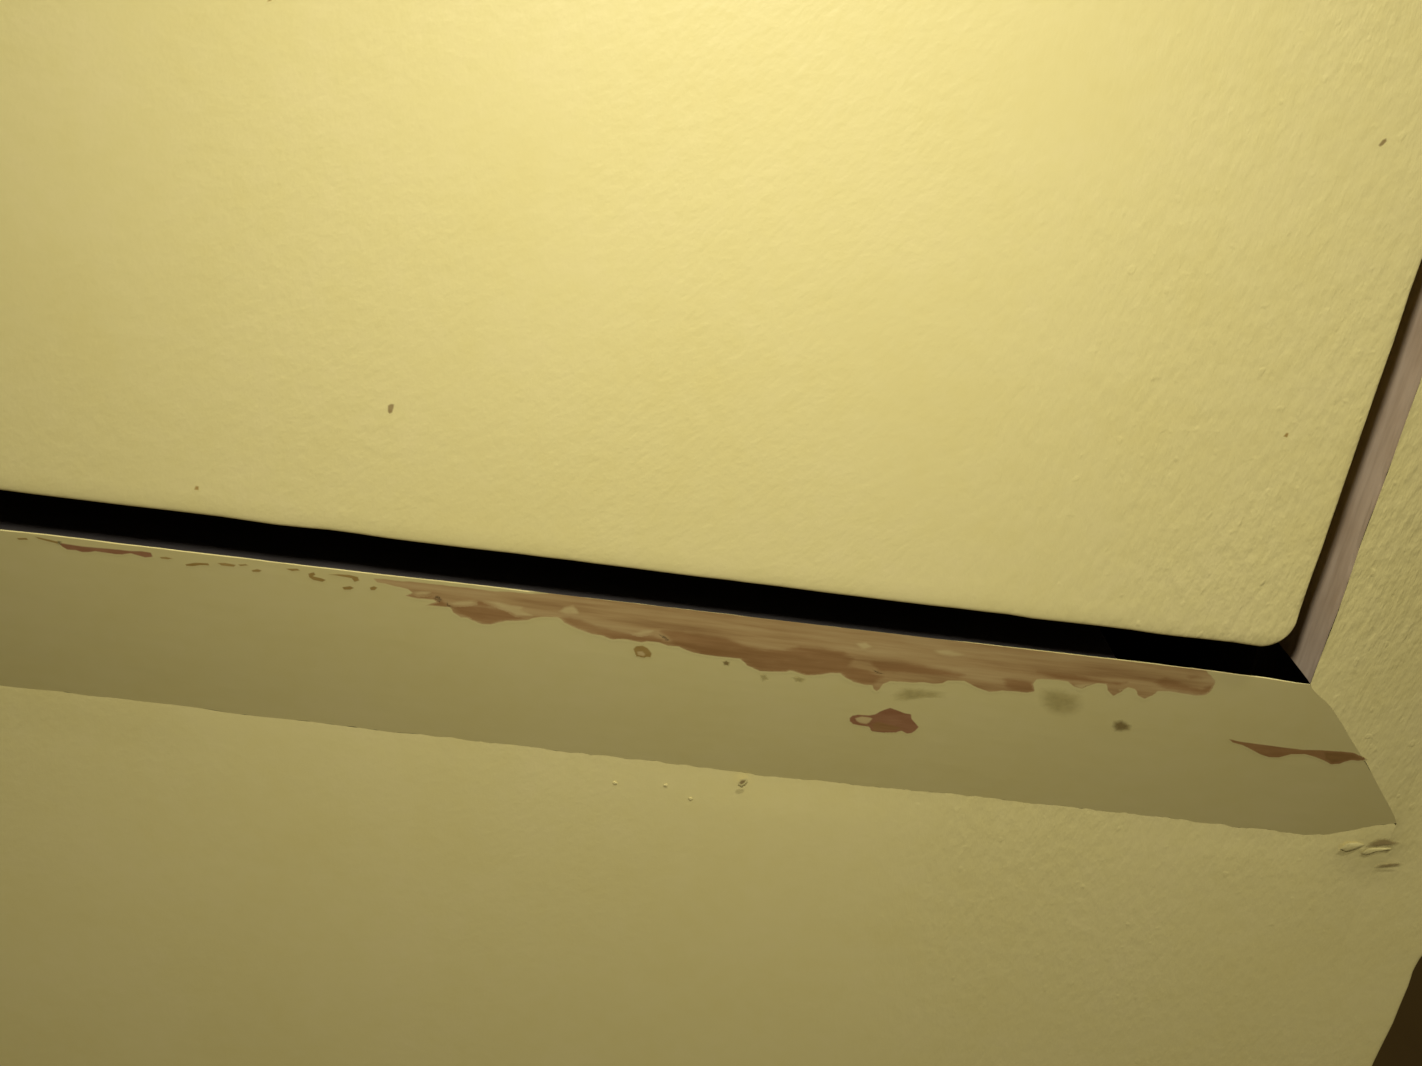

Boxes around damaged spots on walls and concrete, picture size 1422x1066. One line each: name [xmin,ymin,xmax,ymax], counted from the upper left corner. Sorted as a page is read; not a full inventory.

peeling [370,576,1219,735]
peeling [1227,737,1368,765]